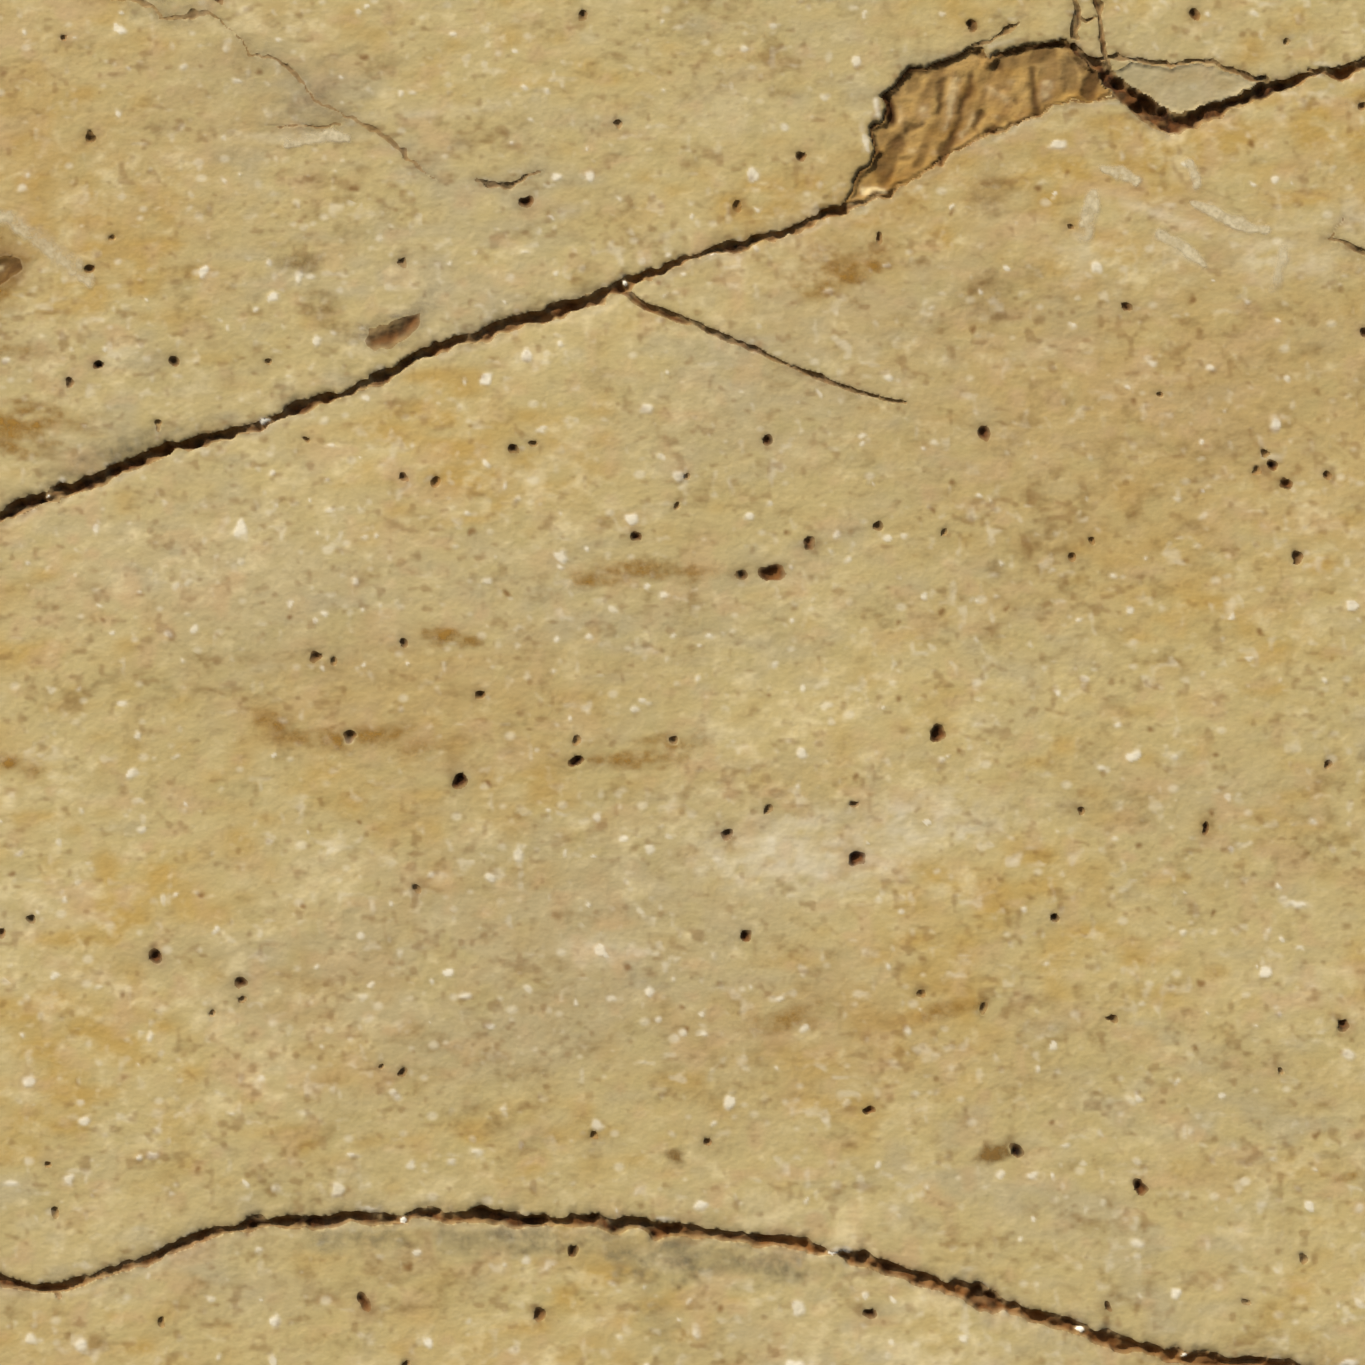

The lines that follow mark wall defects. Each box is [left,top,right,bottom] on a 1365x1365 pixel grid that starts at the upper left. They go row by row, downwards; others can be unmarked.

spalling [846,39,1256,203]
crack [0,0,1365,522]
crack [0,1205,1301,1365]